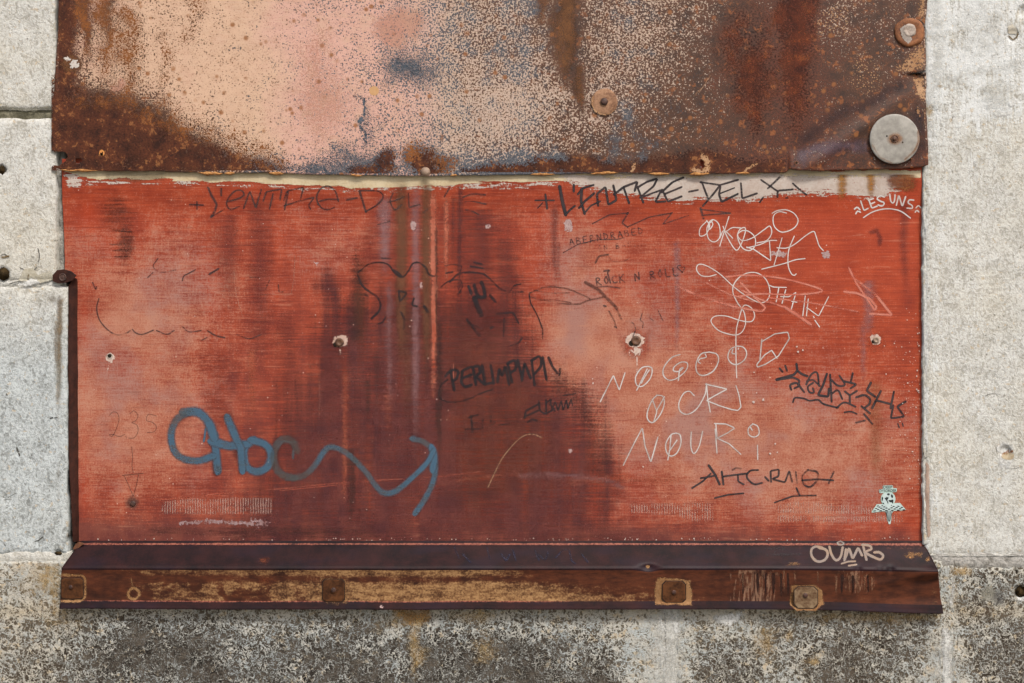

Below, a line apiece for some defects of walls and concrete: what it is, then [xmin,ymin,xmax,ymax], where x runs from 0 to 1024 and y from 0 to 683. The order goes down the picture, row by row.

corrosion [51,0,293,171]
peeling [378,41,441,90]
corrosion [711,0,860,156]
peeling [63,93,921,206]
corrosion [346,138,786,174]
corrosion [913,108,932,151]
corrosion [742,563,795,595]